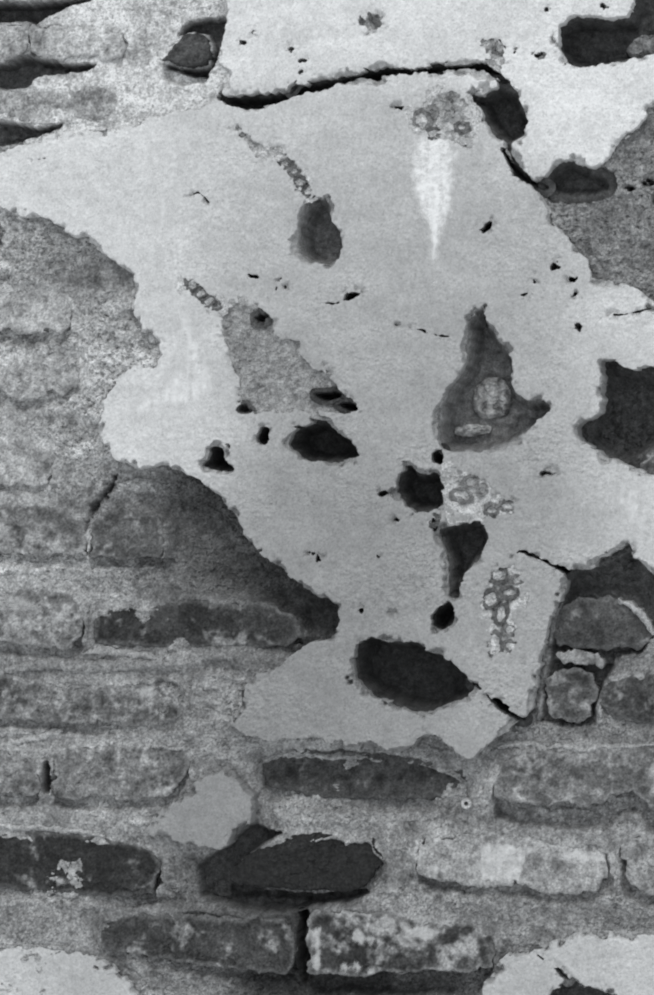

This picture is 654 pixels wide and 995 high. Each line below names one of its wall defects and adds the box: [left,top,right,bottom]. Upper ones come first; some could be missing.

crack [220,63,511,110]
peeling [0,0,654,760]
peeling [146,766,259,850]
peeling [0,946,140,995]
peeling [482,930,654,995]